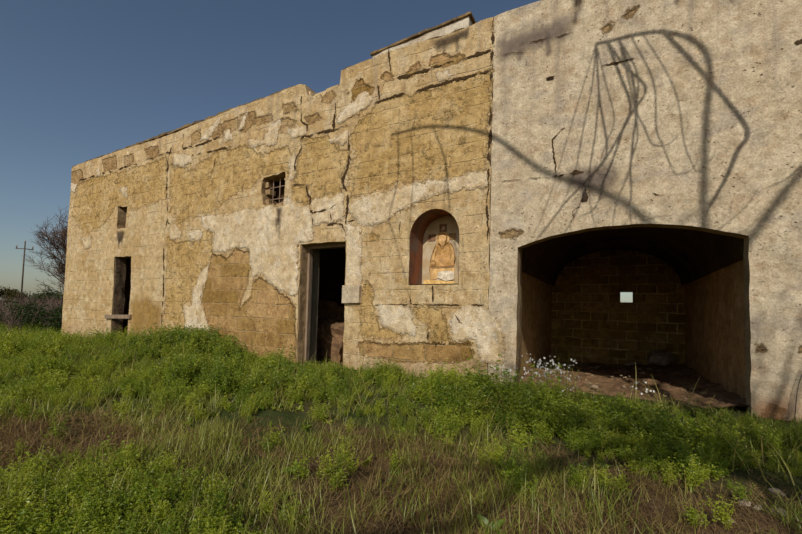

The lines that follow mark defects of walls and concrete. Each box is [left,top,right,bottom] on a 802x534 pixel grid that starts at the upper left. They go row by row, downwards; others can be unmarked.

peeling [70,52,506,366]
crack [284,92,353,234]
crack [374,18,604,240]